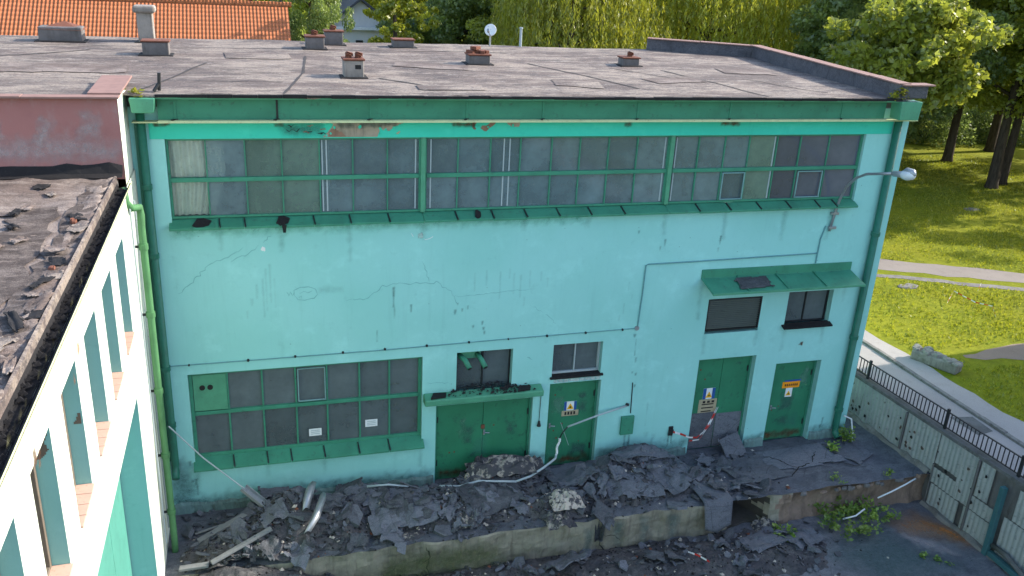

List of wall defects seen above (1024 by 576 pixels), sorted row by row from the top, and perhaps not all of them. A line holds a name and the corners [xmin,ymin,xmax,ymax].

peeling [323,123,401,137]
peeling [472,122,520,131]
crack [770,451,864,477]